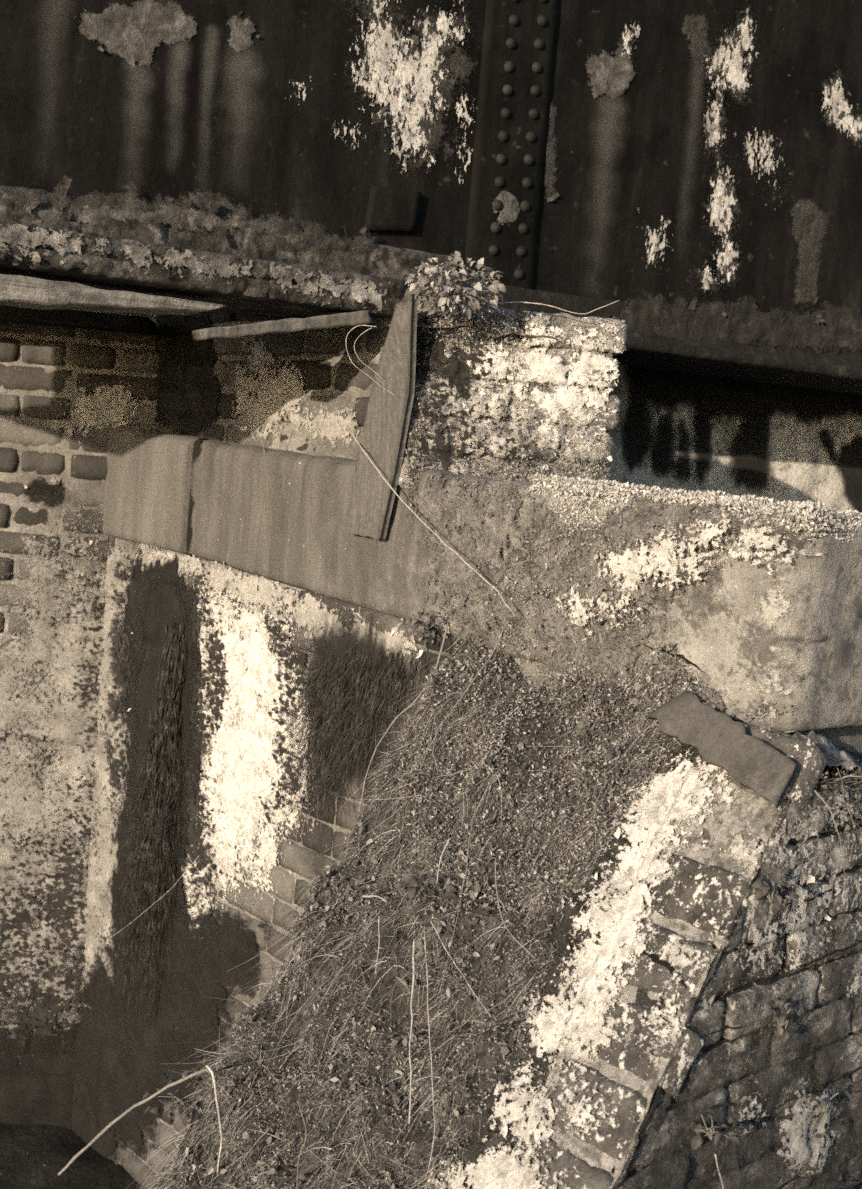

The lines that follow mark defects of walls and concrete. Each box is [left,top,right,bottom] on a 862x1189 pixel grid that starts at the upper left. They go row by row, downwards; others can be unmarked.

peeling [334,0,477,184]
rust [585,50,636,100]
peeling [615,24,640,59]
rust [682,12,712,67]
peeling [821,70,862,147]
rust [544,104,560,202]
peeling [688,6,785,310]
peeling [645,216,674,264]
rust [791,198,828,308]